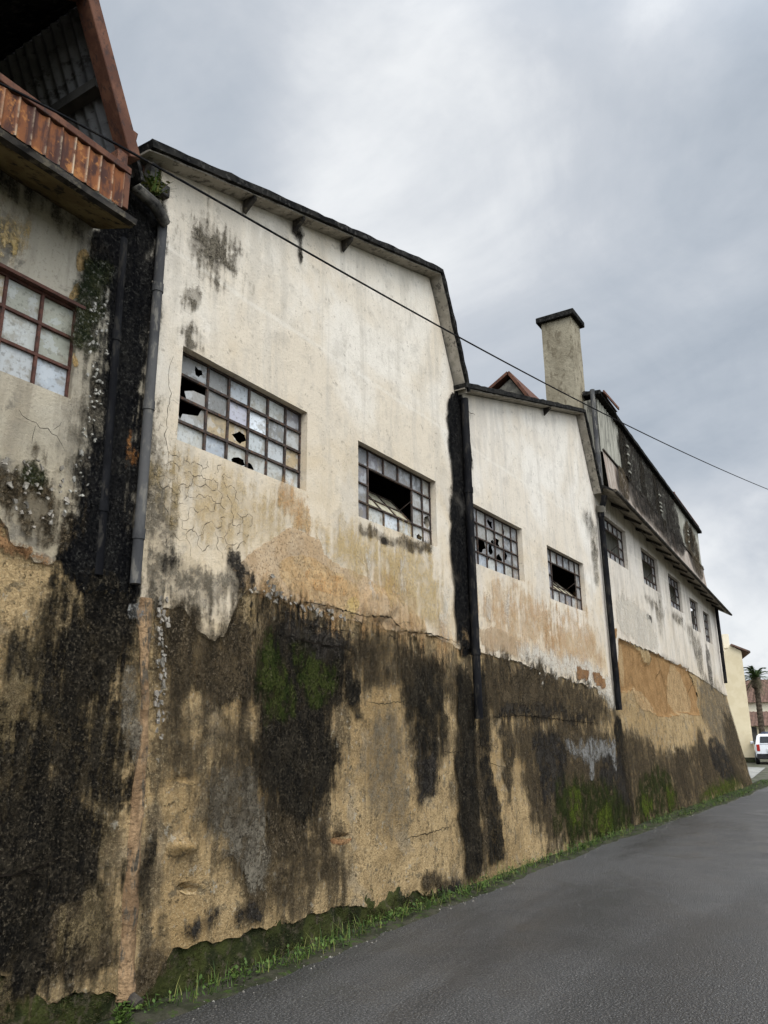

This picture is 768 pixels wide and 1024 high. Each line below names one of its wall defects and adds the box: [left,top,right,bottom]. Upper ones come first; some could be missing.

mould [181,288,204,349]
mould [192,216,241,291]
flaking render [1,293,109,529]
crack [153,358,253,558]
water stain [447,392,458,444]
mould [617,427,704,580]
water stain [0,444,141,1011]
mould [227,548,363,849]
peeling [235,528,426,639]
water stain [326,519,516,883]
water stain [517,642,615,708]
water stain [672,614,713,687]